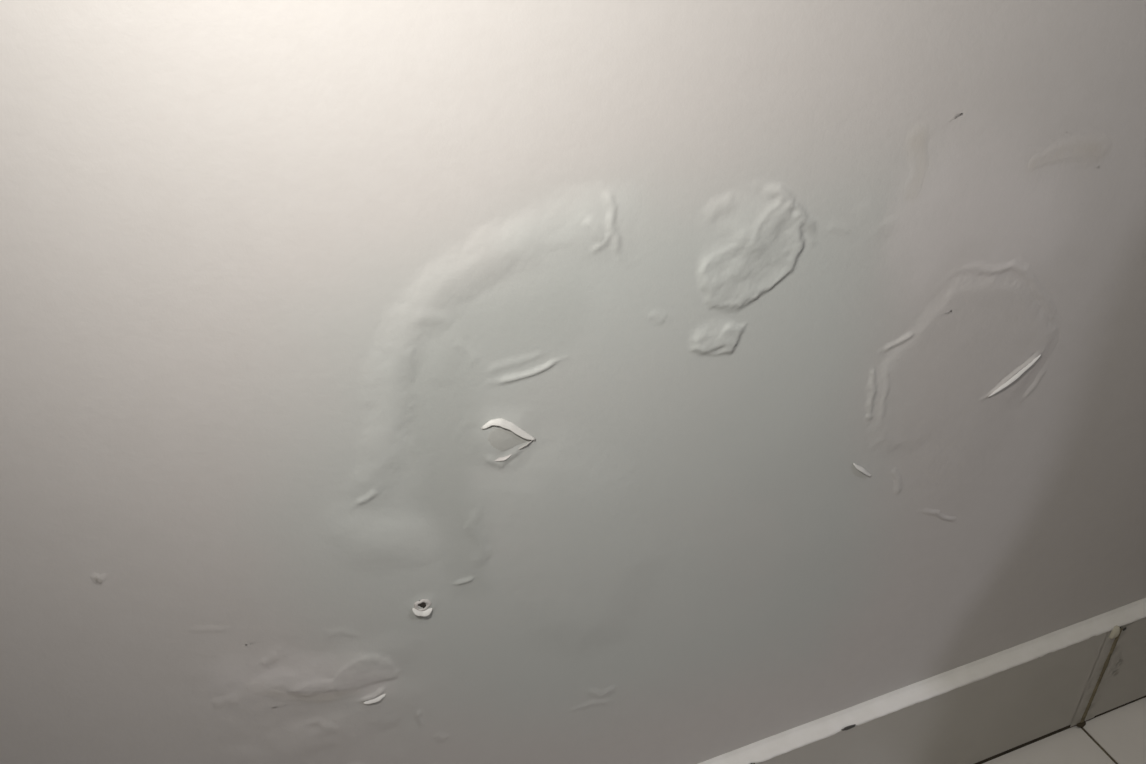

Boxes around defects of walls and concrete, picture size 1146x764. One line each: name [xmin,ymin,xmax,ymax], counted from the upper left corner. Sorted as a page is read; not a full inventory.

peeling [481,418,536,461]
spalling [412,599,432,617]